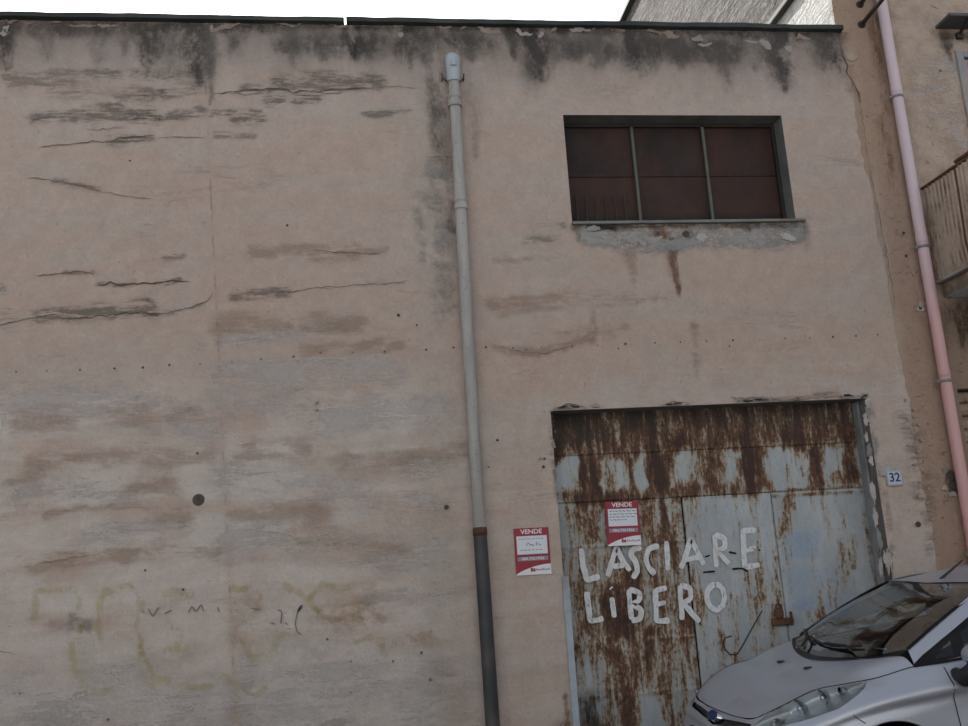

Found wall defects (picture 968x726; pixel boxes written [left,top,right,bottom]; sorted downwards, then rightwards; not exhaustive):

damp [0,20,842,90]
crack [840,42,895,306]
rust [670,239,681,293]
spalling [579,225,805,252]
spalling [732,393,893,582]